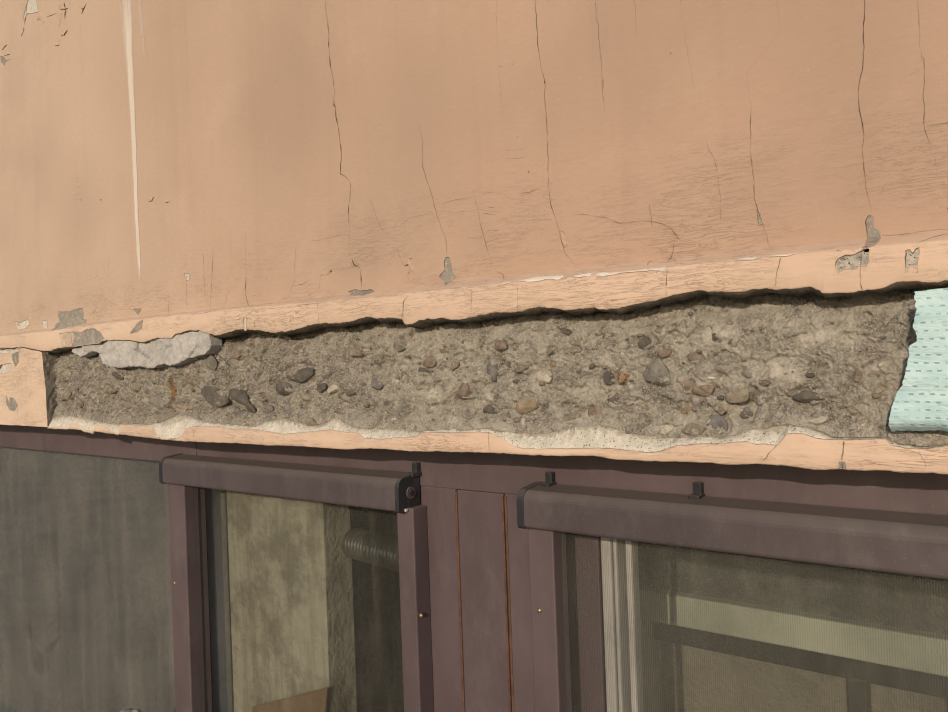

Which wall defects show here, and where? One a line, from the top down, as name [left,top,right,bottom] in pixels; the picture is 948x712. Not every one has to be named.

water stain [123,0,141,275]
peeling [835,215,881,273]
peeling [905,247,921,272]
spalling [503,266,667,284]
peeling [0,349,22,374]
spalling [42,286,948,452]
peeling [6,396,18,411]